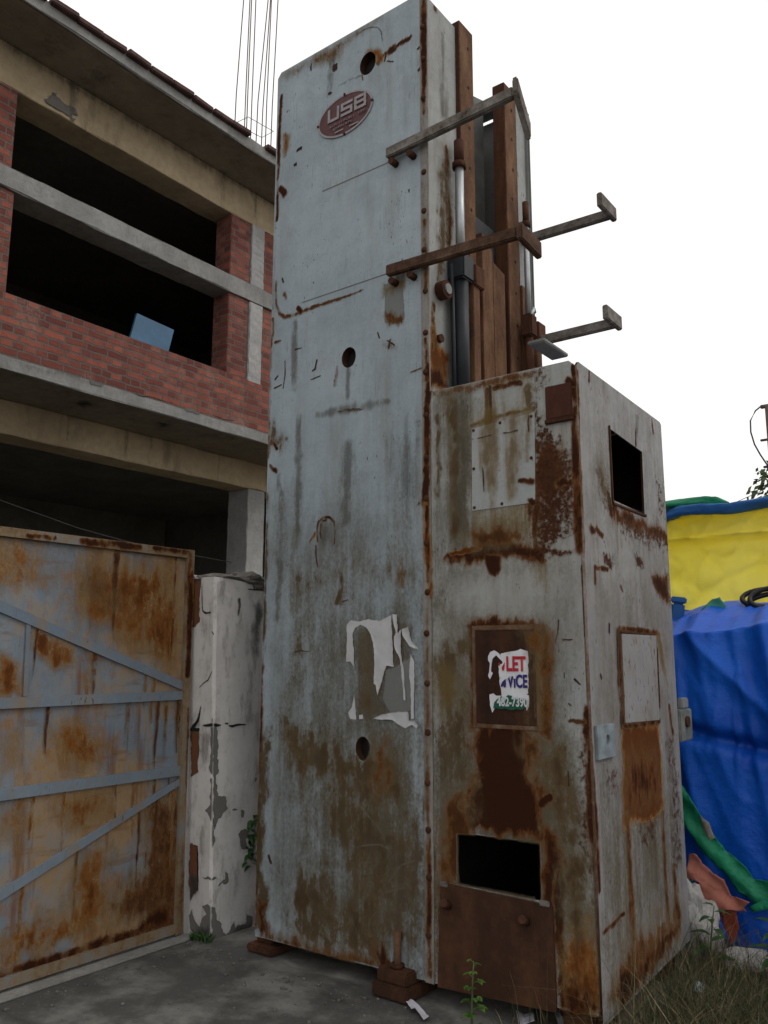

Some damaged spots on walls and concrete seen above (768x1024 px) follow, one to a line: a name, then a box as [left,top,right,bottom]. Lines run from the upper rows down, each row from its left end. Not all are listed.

corrosion [367,0,437,115]
corrosion [276,94,289,222]
corrosion [423,145,454,253]
corrosion [271,277,362,347]
corrosion [421,302,671,637]
corrosion [0,654,21,697]
corrosion [32,628,73,676]
corrosion [75,538,194,678]
corrosion [0,675,189,978]
spalling [190,707,255,850]
corrosion [255,615,681,1015]
spalling [188,843,253,940]